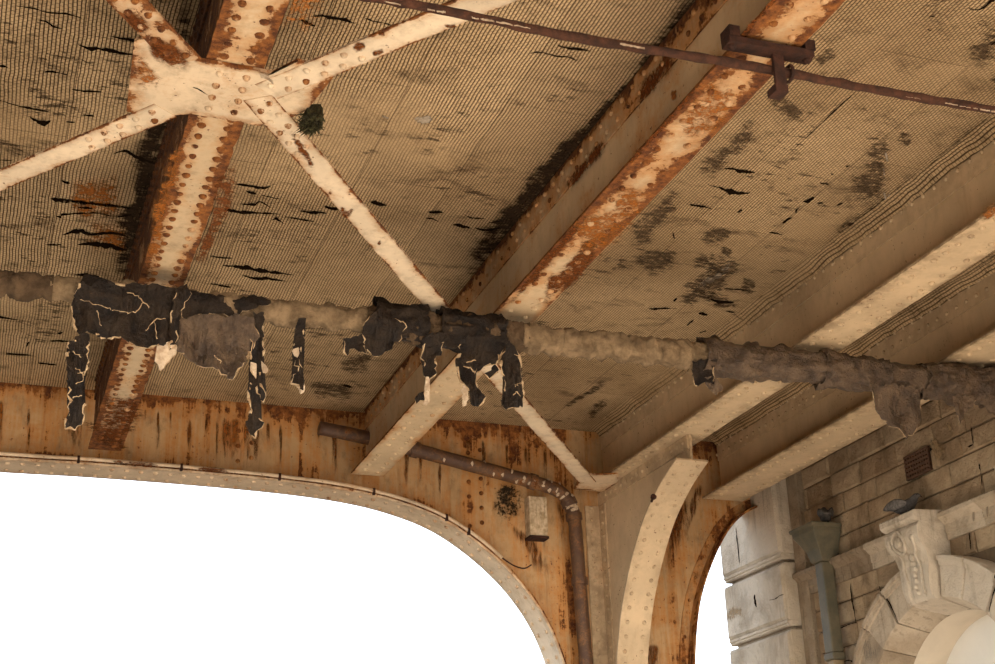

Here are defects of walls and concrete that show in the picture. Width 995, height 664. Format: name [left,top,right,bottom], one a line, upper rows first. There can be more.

corrosion [137,39,187,84]
corrosion [640,56,672,100]
damp [969,29,995,64]
corrosion [292,134,313,166]
damp [470,0,696,276]
damp [838,132,911,233]
corrosion [512,188,642,303]
damp [681,229,755,308]
corrosion [69,397,158,468]
damp [494,485,521,518]
corrosion [668,488,701,556]
corrosion [648,646,658,664]